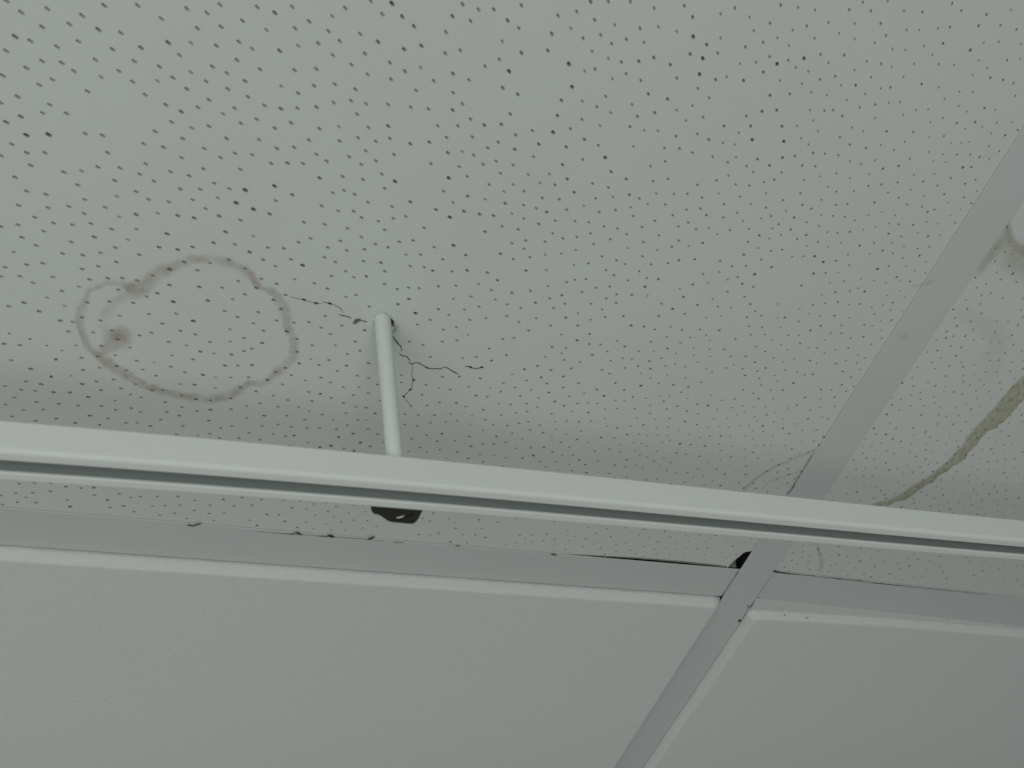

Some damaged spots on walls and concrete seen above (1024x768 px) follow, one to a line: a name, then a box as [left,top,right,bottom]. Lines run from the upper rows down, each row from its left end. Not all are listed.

crack [297,298,367,324]
crack [392,335,484,406]